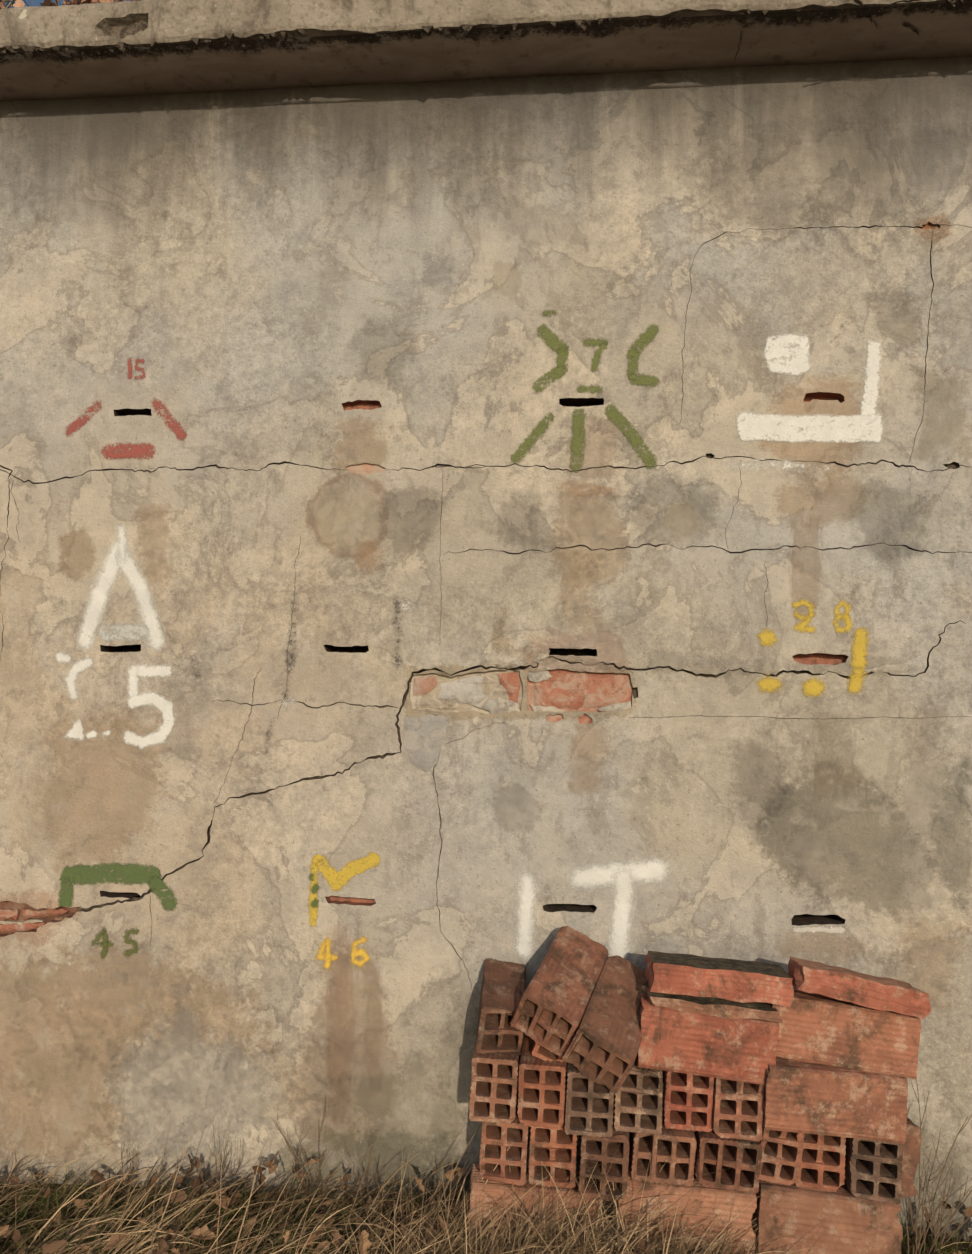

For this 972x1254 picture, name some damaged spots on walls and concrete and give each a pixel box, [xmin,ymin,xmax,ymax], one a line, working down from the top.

crack [0,461,349,660]
crack [78,224,972,982]
spalling [403,669,638,772]
spalling [0,901,81,937]